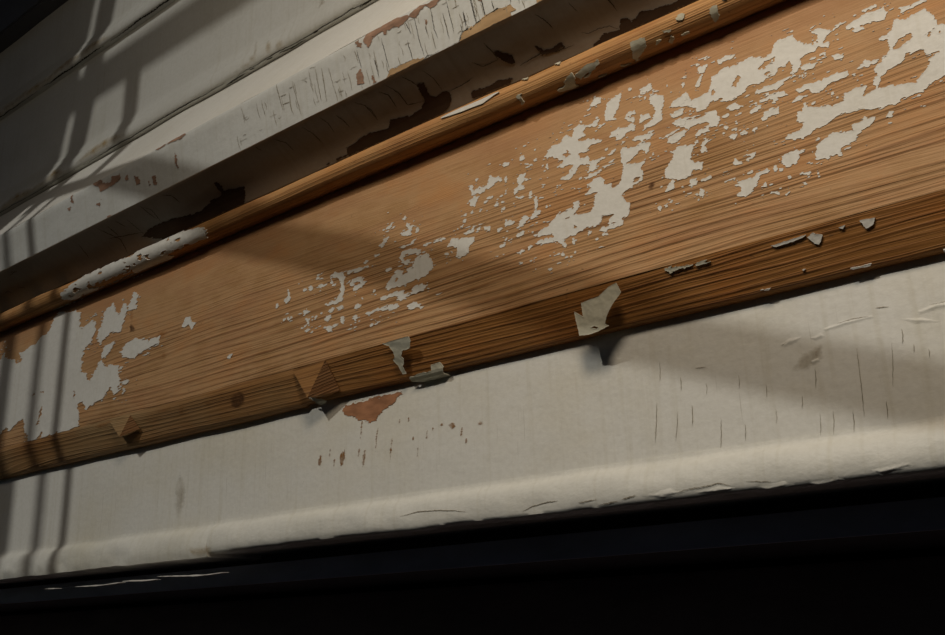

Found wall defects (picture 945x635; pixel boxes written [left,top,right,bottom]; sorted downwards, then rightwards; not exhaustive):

crack [0,0,371,213]
crack [238,0,552,150]
peeling [93,175,157,206]
peeling [275,0,945,336]
peeling [0,182,246,442]
peeling [342,391,402,423]
peeling [382,336,451,382]
crack [655,367,707,438]
crack [802,329,903,435]